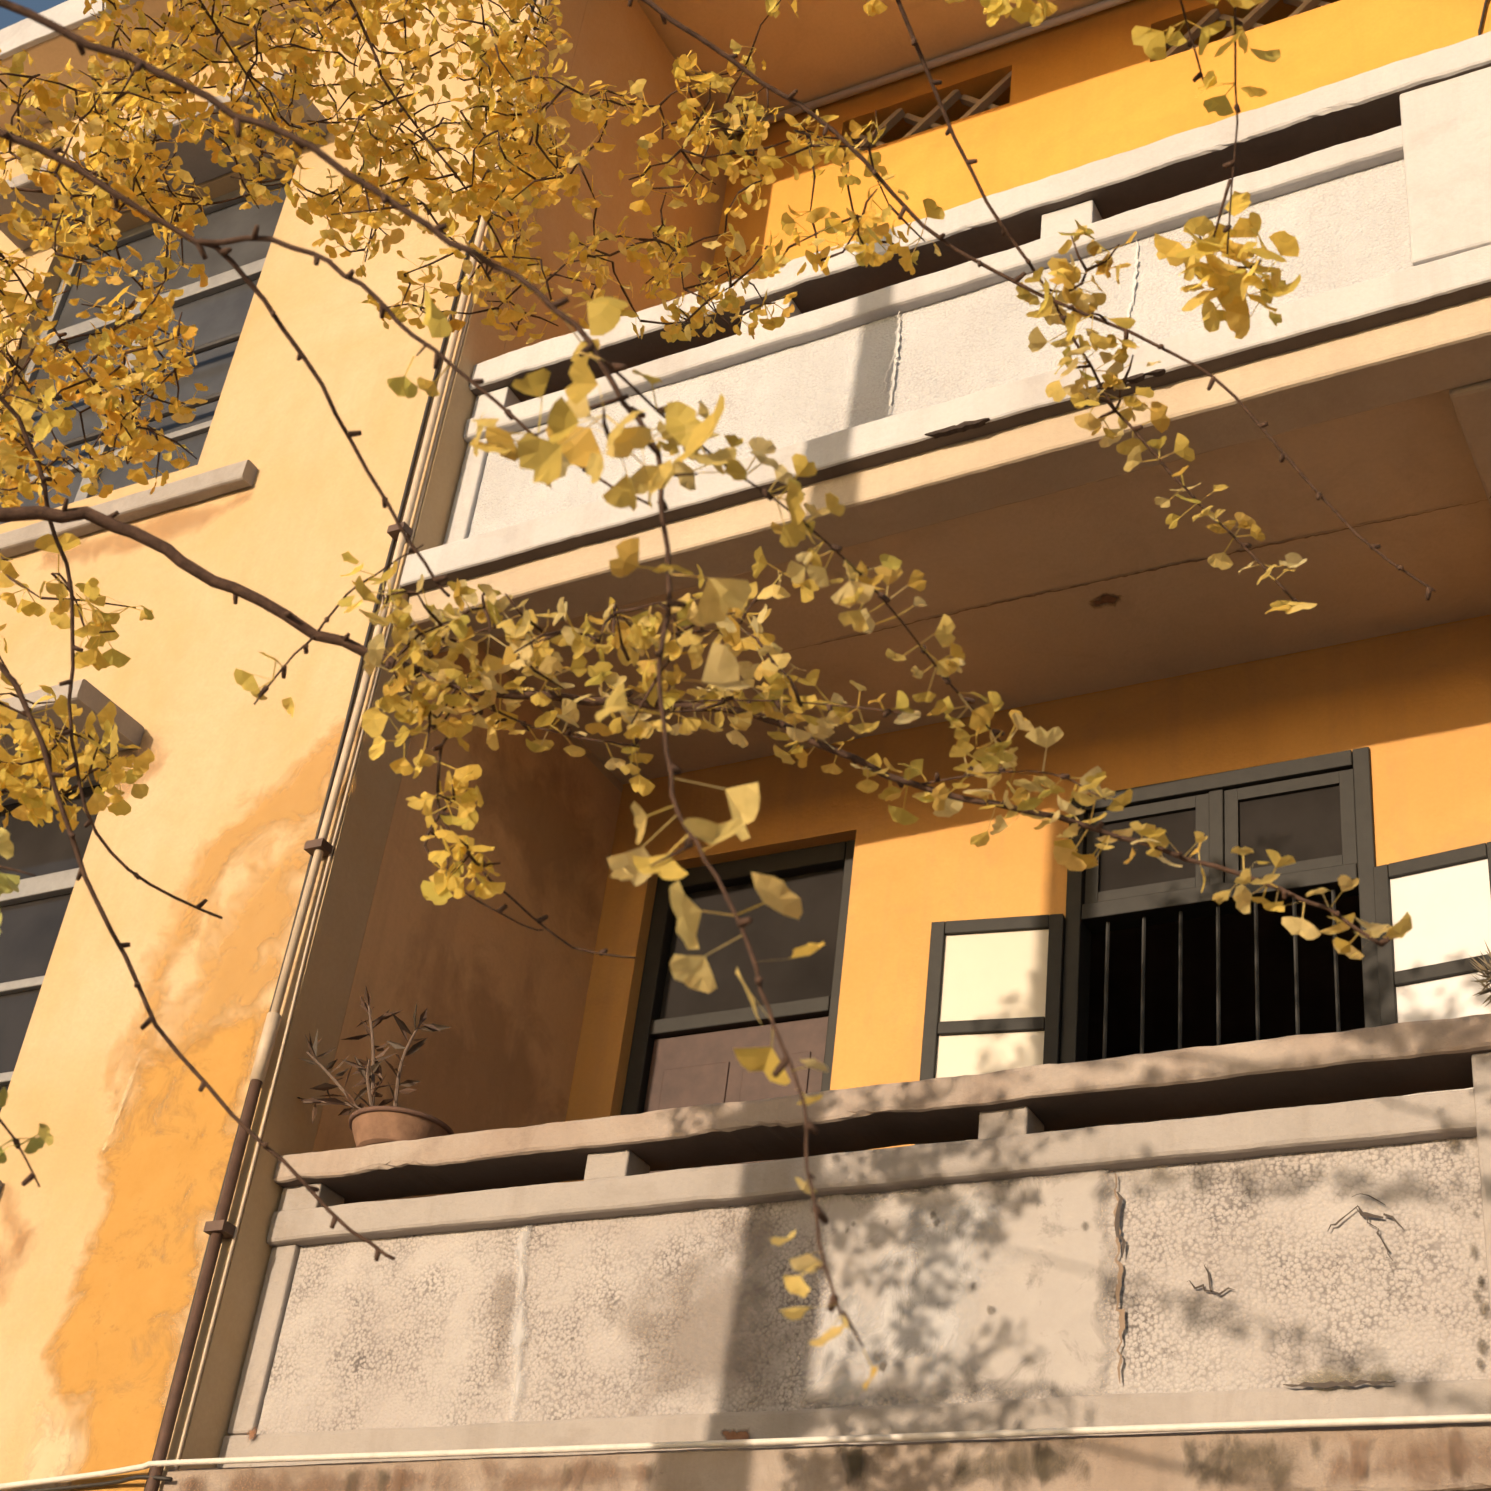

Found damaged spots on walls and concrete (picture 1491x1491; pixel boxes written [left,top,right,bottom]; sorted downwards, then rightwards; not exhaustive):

crack [786,496,1491,652]
crack [1113,1173,1126,1383]
crack [1328,1193,1403,1261]
water stain [956,1448,1087,1481]